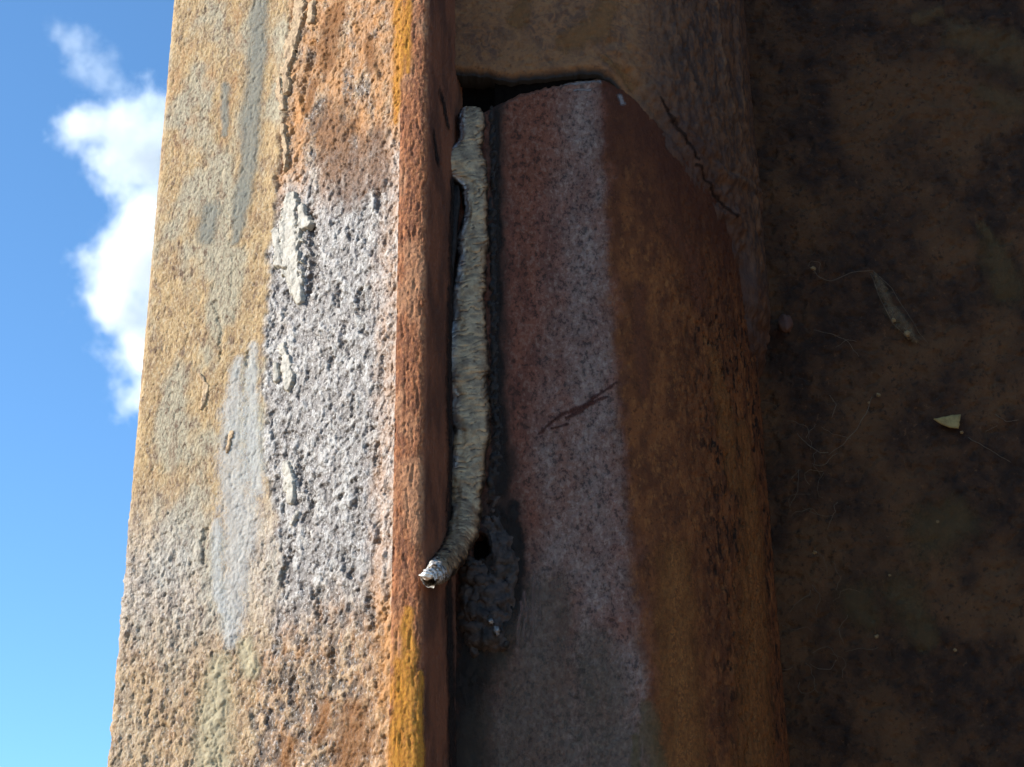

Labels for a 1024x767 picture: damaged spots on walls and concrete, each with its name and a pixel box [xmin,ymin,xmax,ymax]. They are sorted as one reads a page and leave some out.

rust [303,1,345,112]
rust [364,36,375,71]
rust [393,0,412,124]
crack [661,97,739,217]
peeling [271,227,282,270]
peeling [297,203,315,231]
peeling [273,362,281,384]
rust [390,606,425,767]